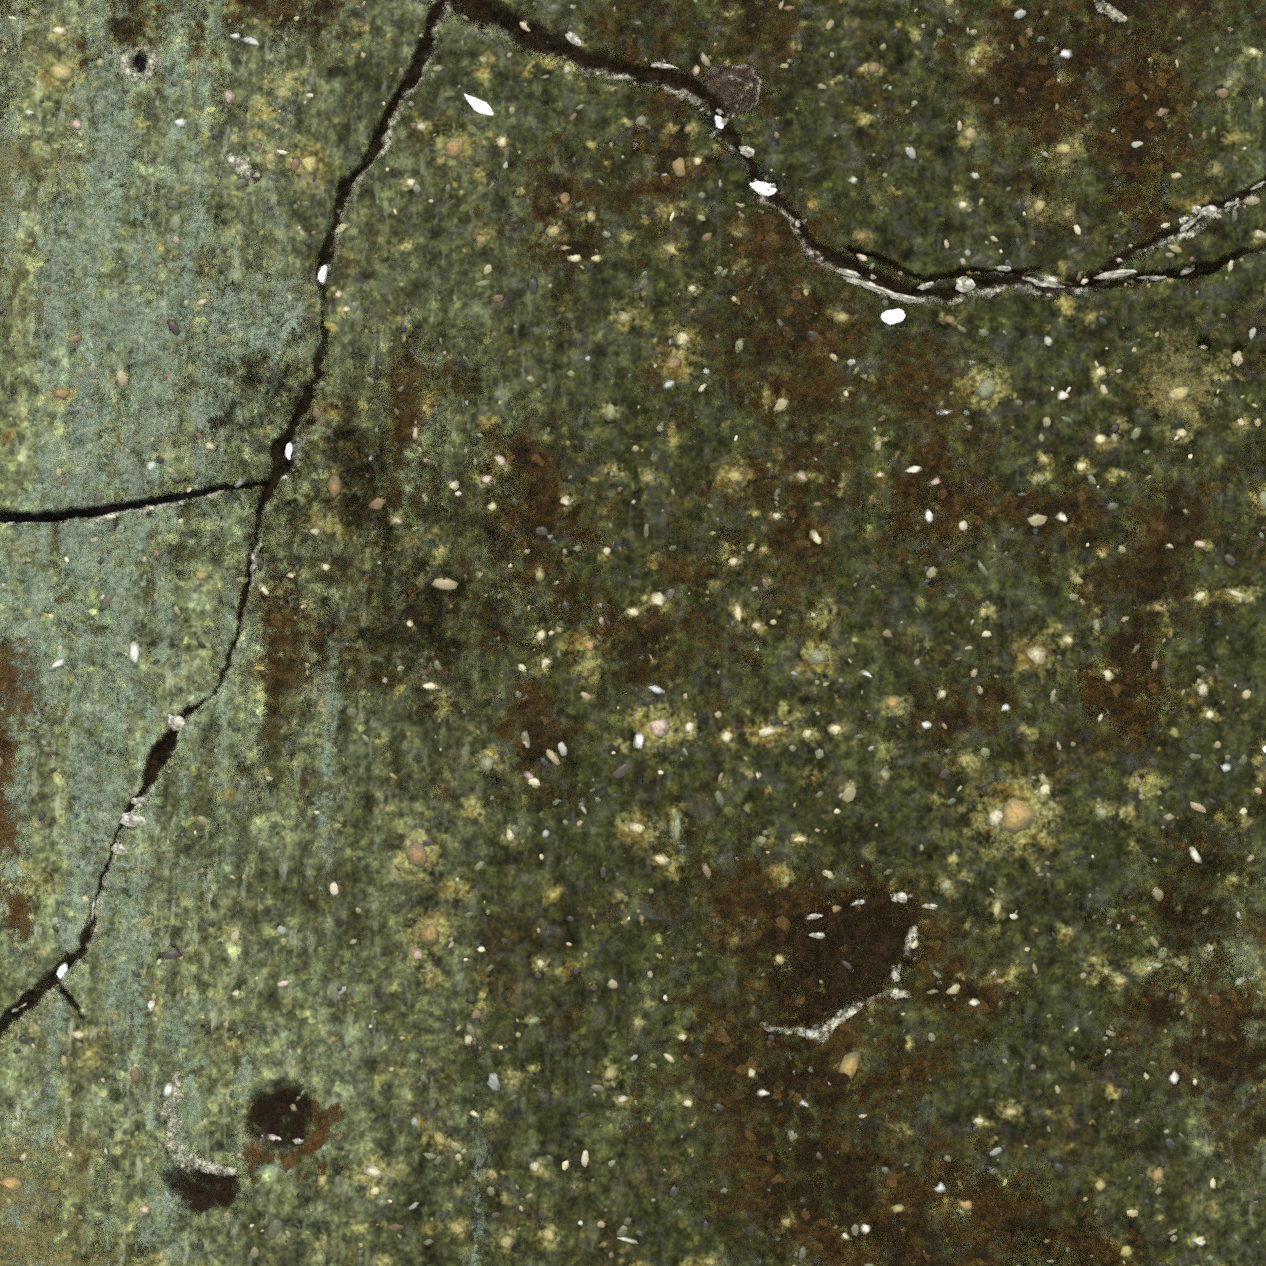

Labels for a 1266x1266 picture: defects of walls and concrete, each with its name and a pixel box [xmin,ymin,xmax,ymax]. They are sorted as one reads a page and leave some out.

crack [317,0,1266,325]
corrosion [0,637,37,856]
corrosion [5,876,34,942]
crack [0,321,328,1036]